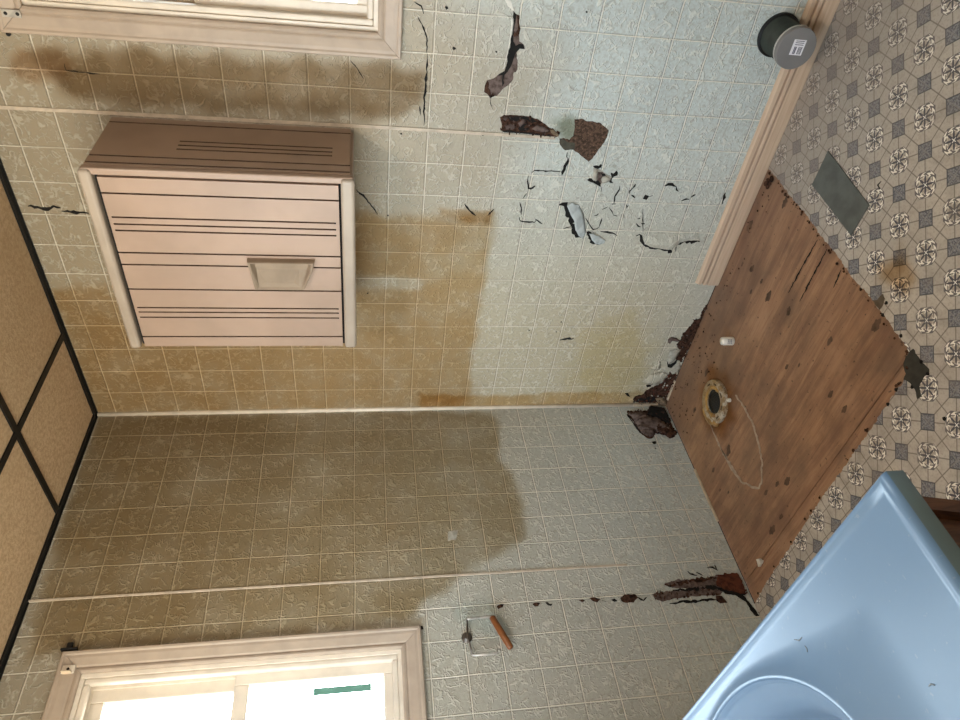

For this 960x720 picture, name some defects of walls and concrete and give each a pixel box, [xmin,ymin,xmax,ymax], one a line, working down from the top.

crack [415,2,428,123]
spalling [500,115,618,192]
crack [28,205,89,214]
peeling [559,202,605,245]
spalling [625,349,681,424]
spalling [620,594,647,603]